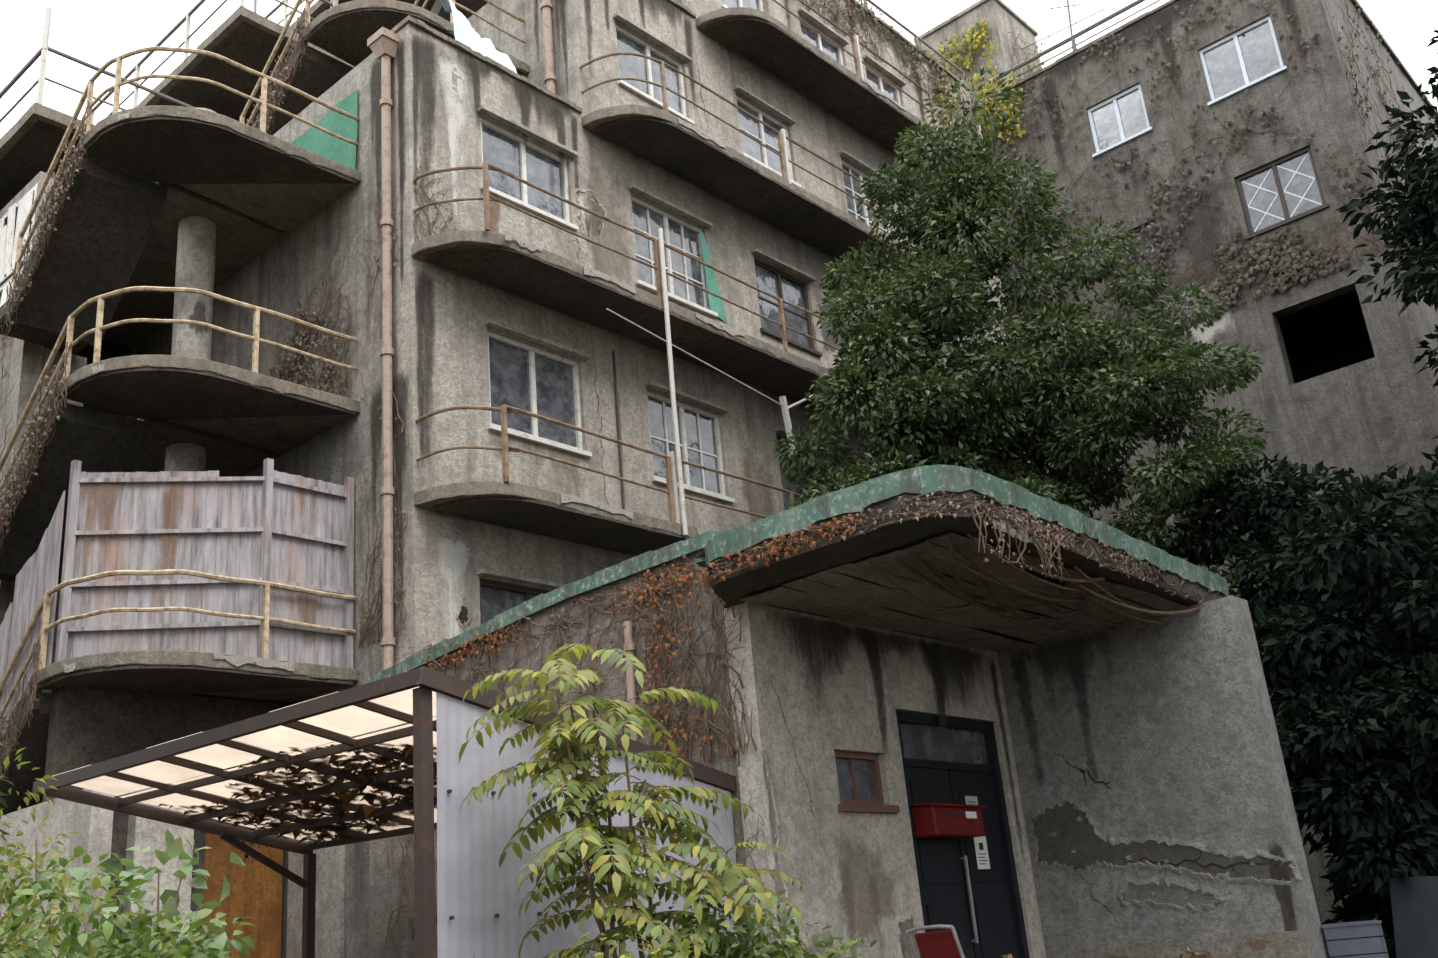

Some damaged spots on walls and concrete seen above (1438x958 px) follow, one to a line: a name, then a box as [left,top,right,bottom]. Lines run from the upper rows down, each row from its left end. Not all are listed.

water stain [866,633,886,742]
water stain [926,646,945,734]
water stain [991,663,1021,841]
water stain [1013,633,1107,779]